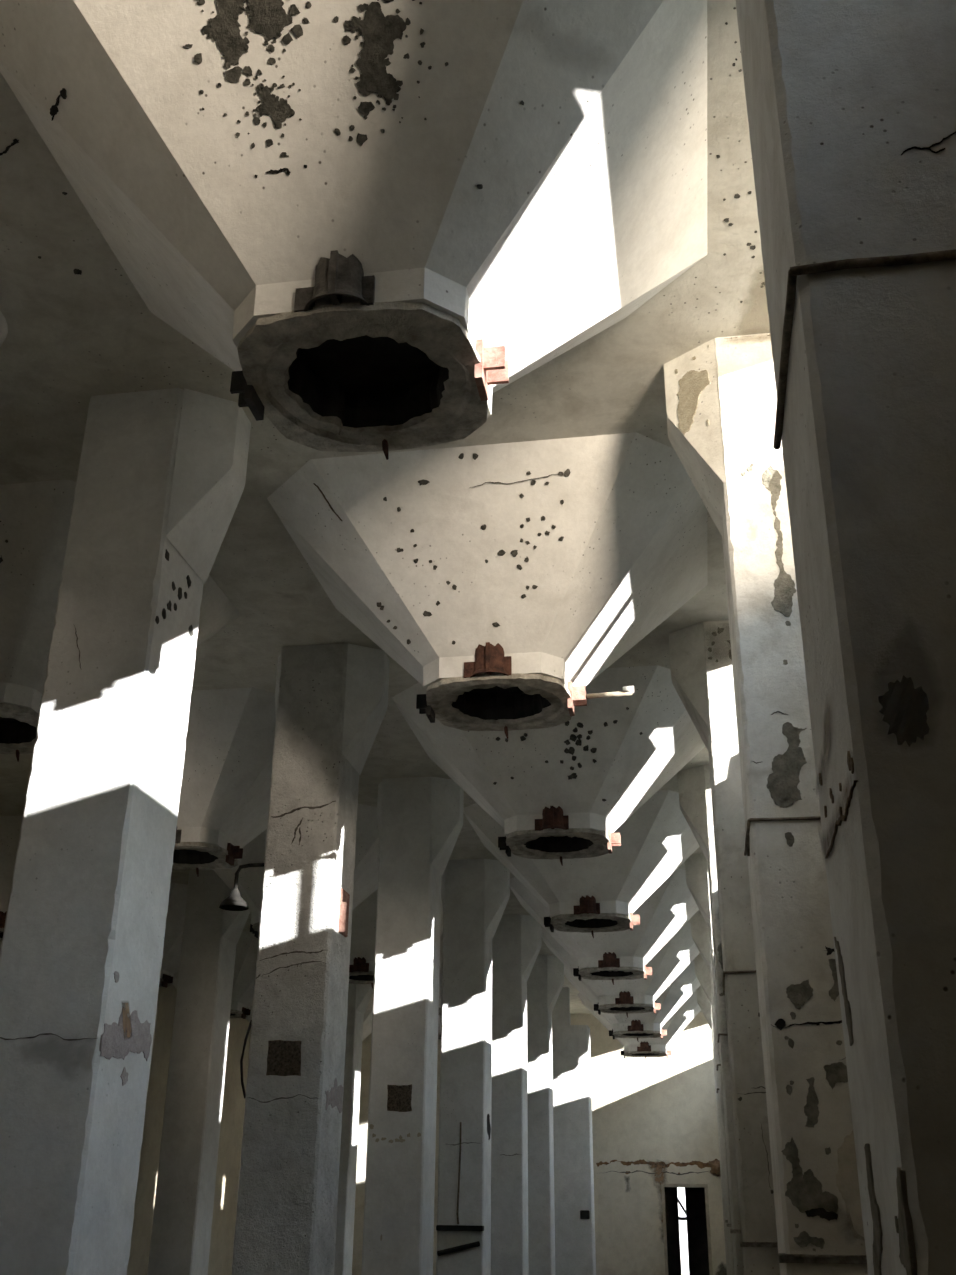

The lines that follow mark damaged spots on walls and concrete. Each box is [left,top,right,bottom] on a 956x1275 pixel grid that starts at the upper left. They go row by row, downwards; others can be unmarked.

peeling [197,0,312,157]
peeling [333,0,449,145]
crack [901,131,956,155]
peeling [675,356,710,435]
crack [469,469,570,488]
peeling [741,463,797,626]
peeling [766,722,807,808]
crack [819,751,859,858]
crack [256,950,326,979]
crack [0,1033,96,1041]
crack [758,1012,842,1030]
peeling [864,1143,917,1275]